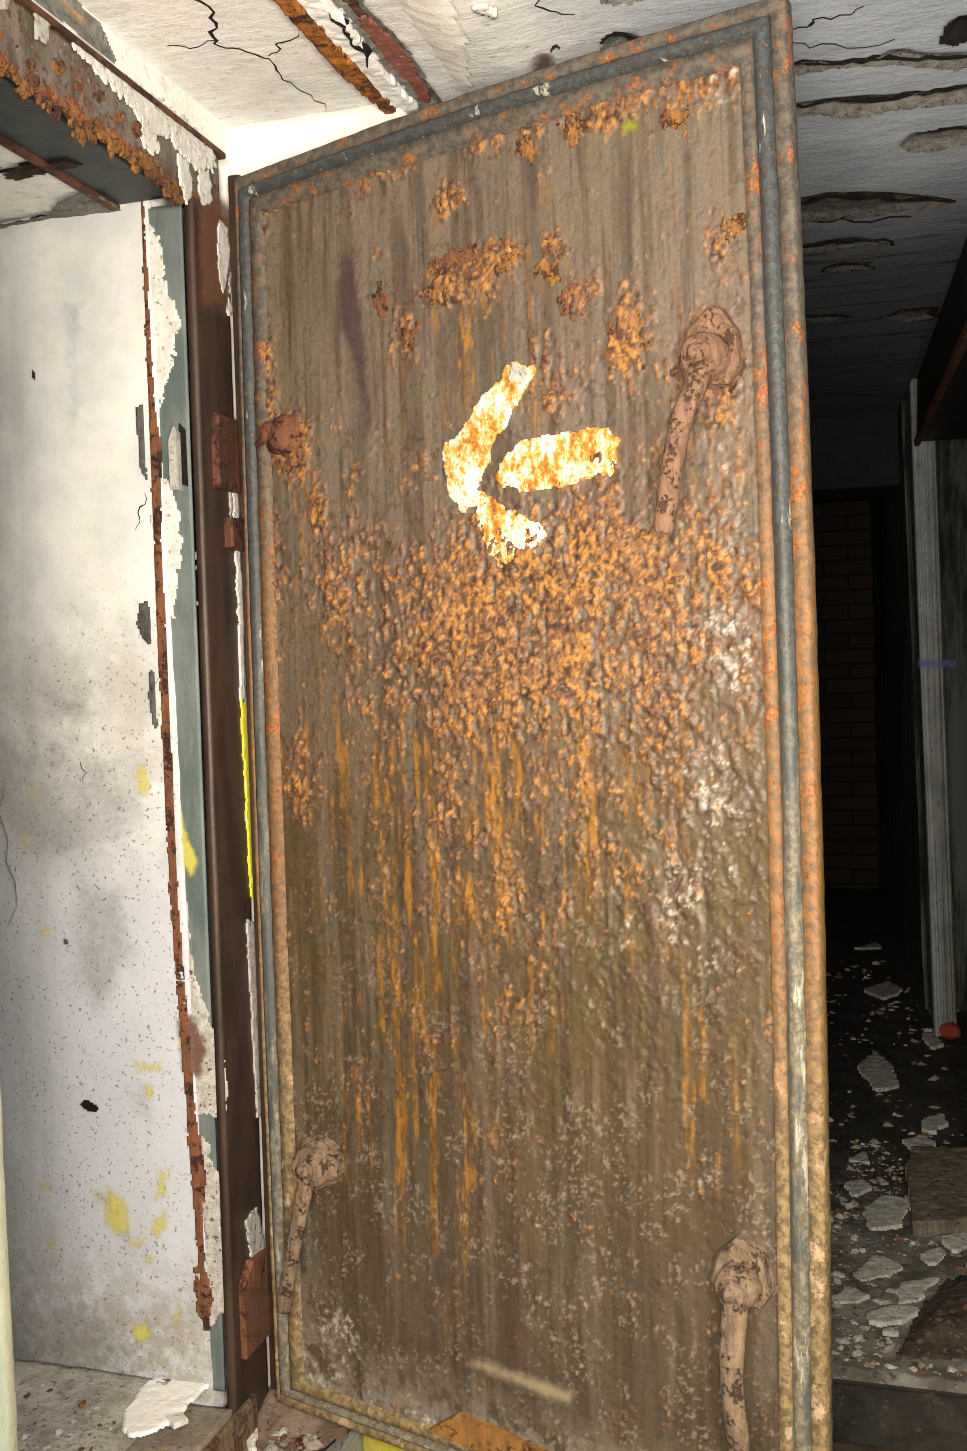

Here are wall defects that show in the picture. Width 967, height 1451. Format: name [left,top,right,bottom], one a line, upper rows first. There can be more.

corrosion [0,29,232,307]
crack [167,0,327,110]
corrosion [533,44,560,71]
crack [534,0,575,15]
corrosion [659,98,690,138]
spalling [794,15,967,118]
spalling [801,191,956,273]
corrosion [367,234,591,351]
peeling [135,200,197,619]
peeling [229,492,240,519]
peeling [136,601,151,644]
corrosion [141,201,214,1331]